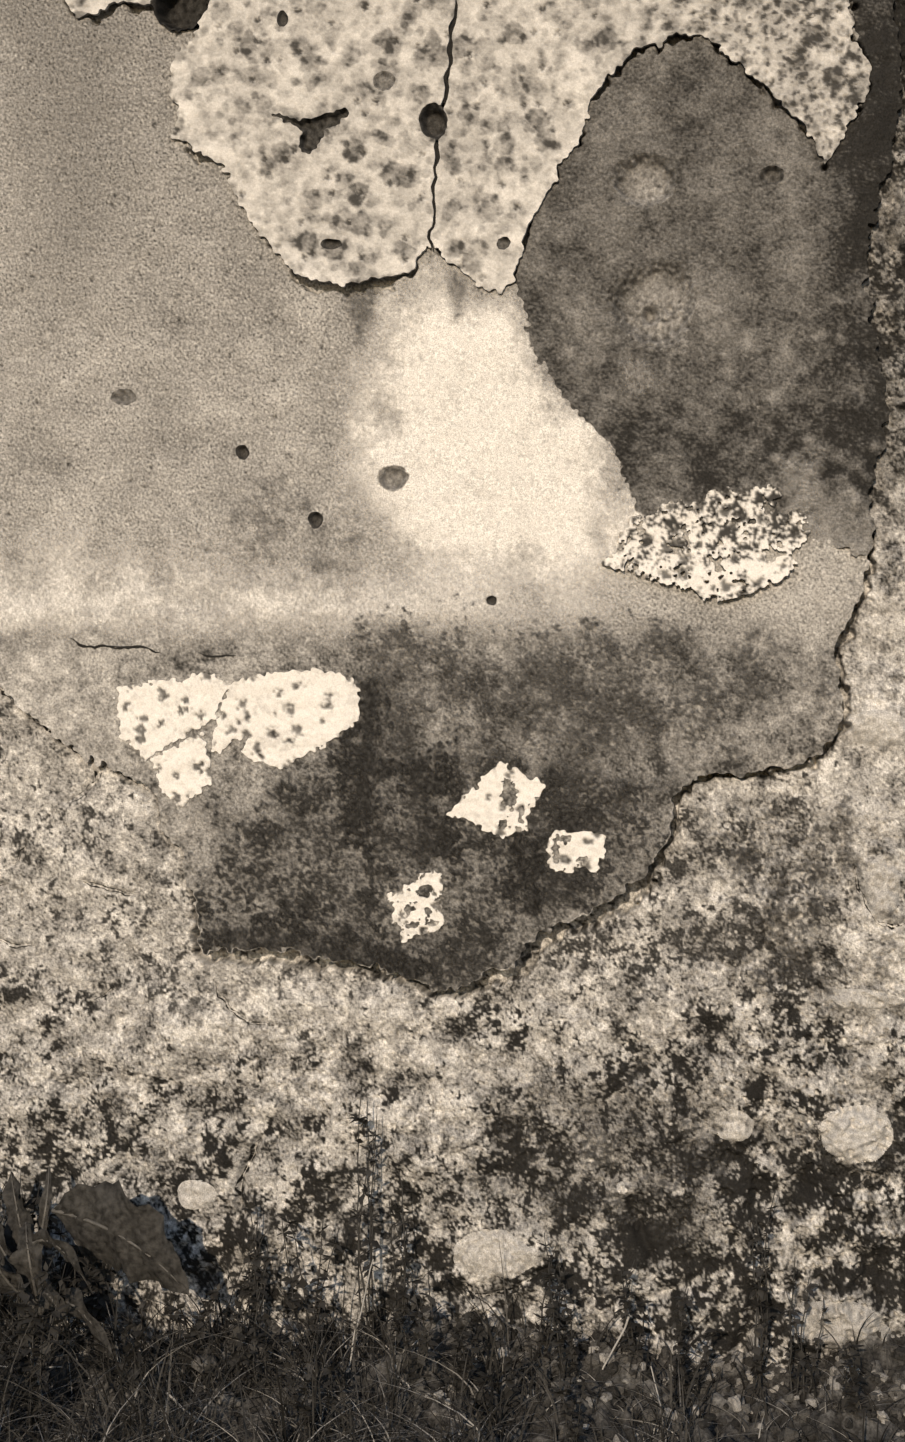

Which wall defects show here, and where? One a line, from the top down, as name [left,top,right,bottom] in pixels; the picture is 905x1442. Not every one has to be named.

flaking render [65,0,151,20]
flaking render [168,0,456,288]
crack [427,142,440,252]
crack [442,0,458,108]
spalling [430,0,905,602]
water stain [0,265,778,990]
water stain [814,683,833,712]
spalling [0,271,905,1371]
water stain [674,795,878,1012]